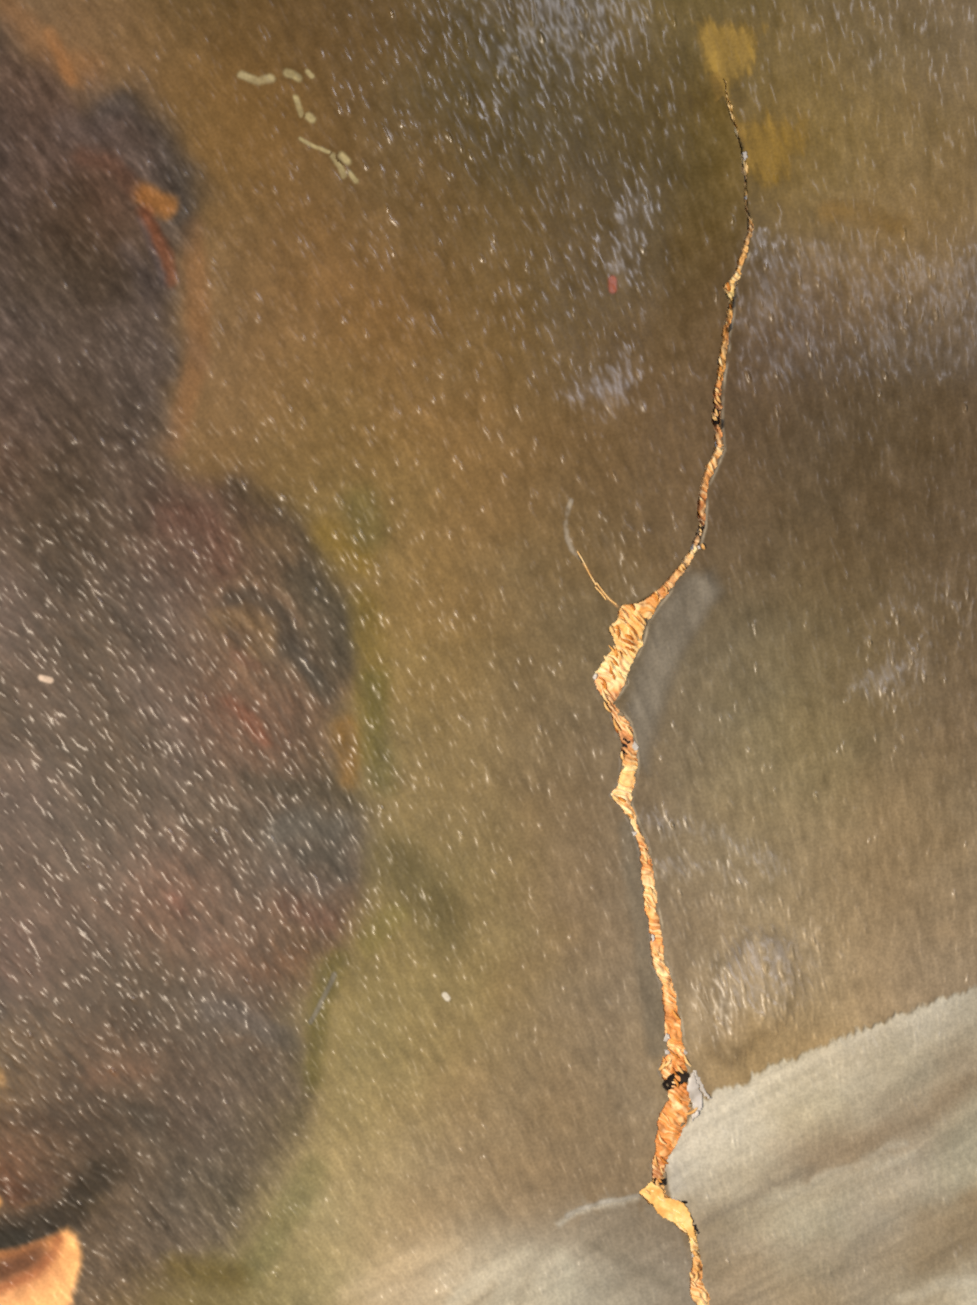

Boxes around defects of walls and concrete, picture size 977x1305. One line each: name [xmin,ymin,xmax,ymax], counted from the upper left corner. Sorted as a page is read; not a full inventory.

water stain [701,21,757,92]
water stain [738,118,804,181]
crack [565,81,754,1305]